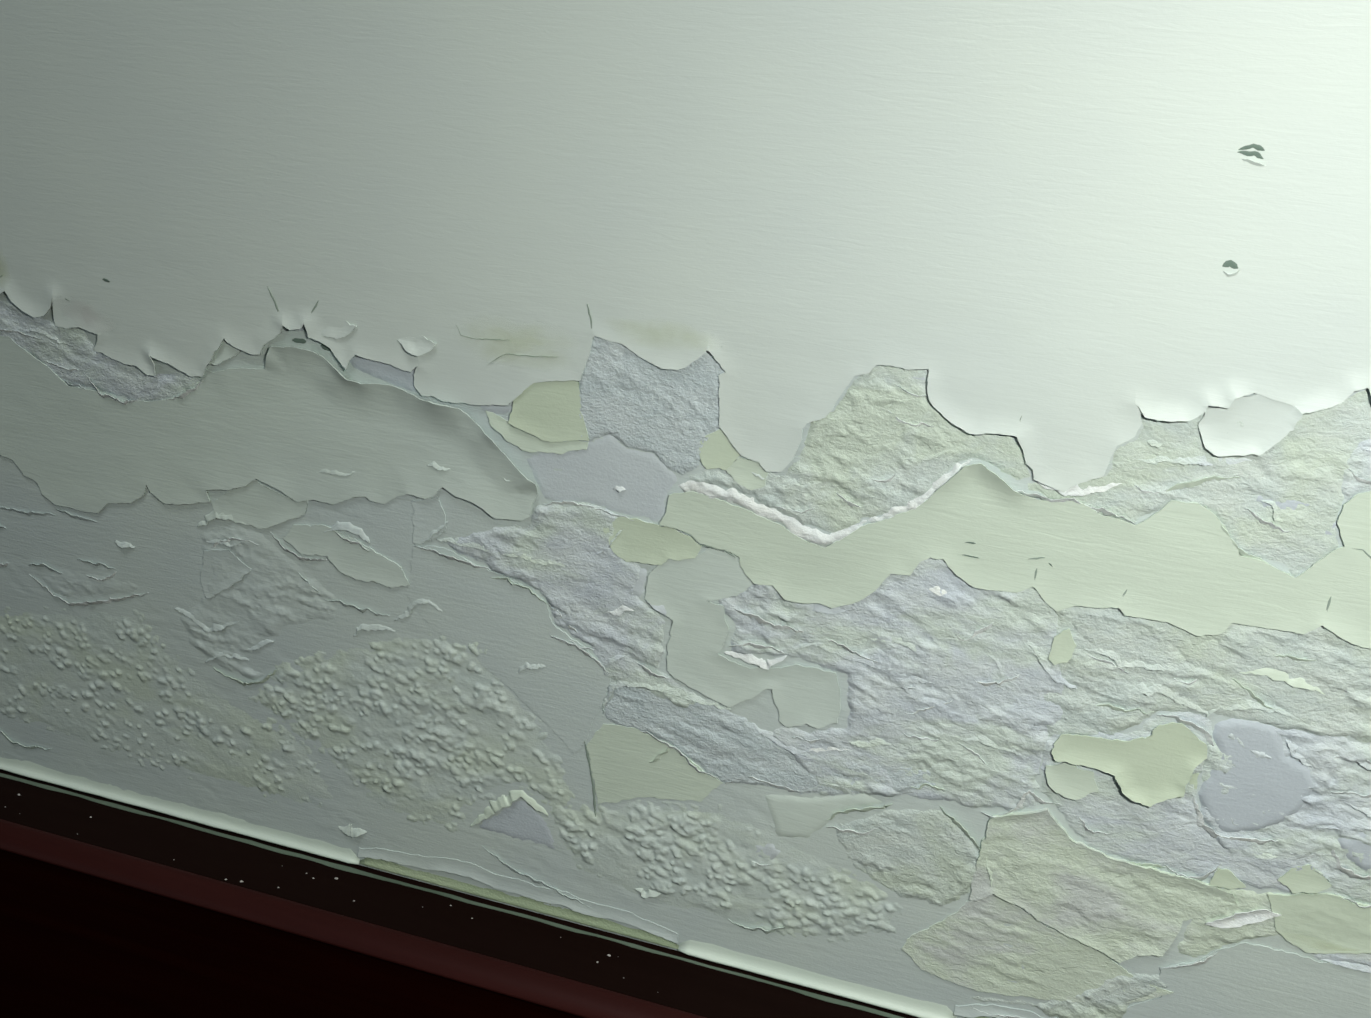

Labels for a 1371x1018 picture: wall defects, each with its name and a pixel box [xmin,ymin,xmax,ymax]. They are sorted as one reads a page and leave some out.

peeling [1237,144,1266,166]
peeling [0,234,1371,1018]